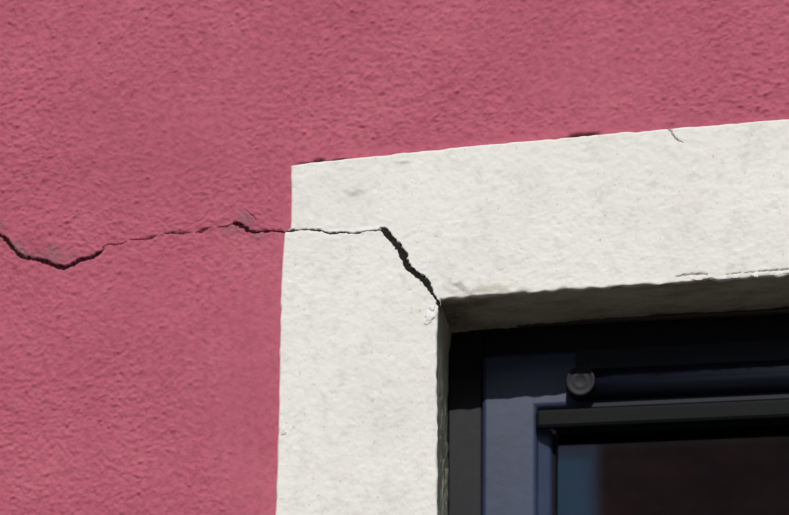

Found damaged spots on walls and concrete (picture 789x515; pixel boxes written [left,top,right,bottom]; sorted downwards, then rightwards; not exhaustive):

crack [0,209,442,313]